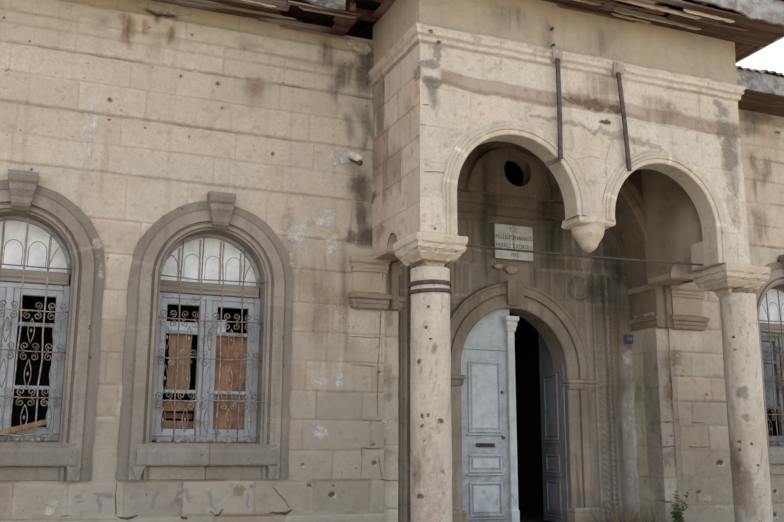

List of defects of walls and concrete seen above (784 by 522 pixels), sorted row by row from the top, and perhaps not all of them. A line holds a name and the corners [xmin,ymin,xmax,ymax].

water stain [146,9,175,18]
water stain [348,179,376,246]